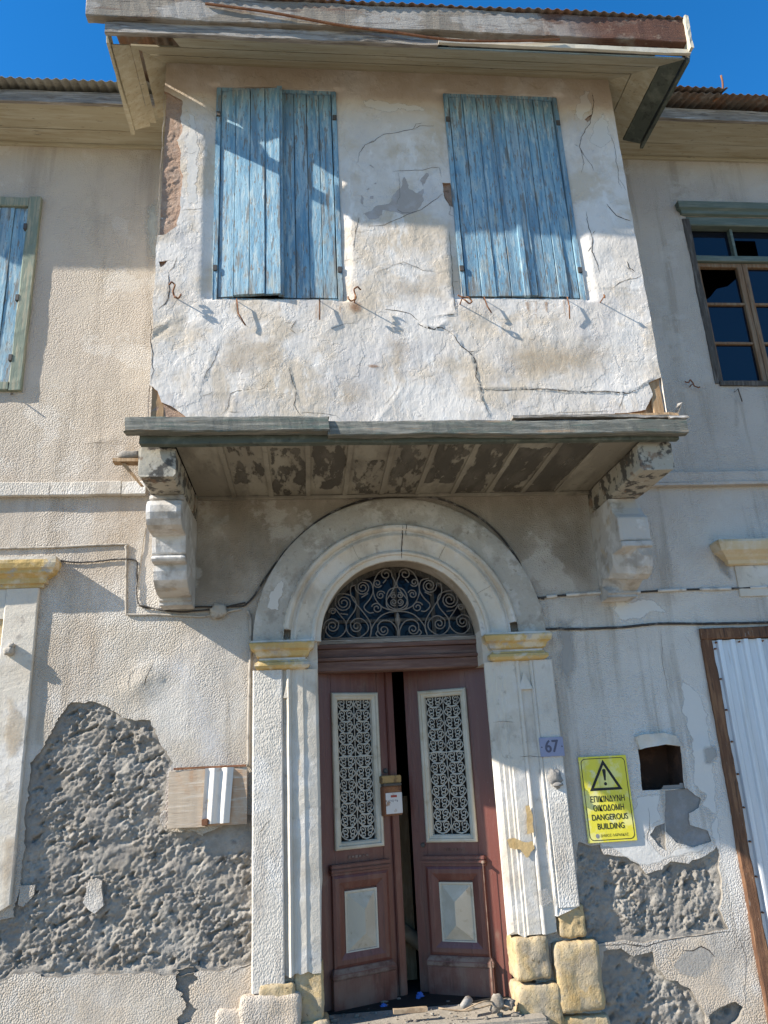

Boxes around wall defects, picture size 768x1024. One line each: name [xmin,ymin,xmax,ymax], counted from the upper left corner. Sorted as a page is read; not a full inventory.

spalling [160,93,199,235]
peeling [361,173,429,219]
crack [353,167,643,413]
crack [576,94,640,287]
peeling [227,443,596,495]
spalling [0,701,252,1024]
peeling [507,805,534,858]
spalling [576,682,740,1024]